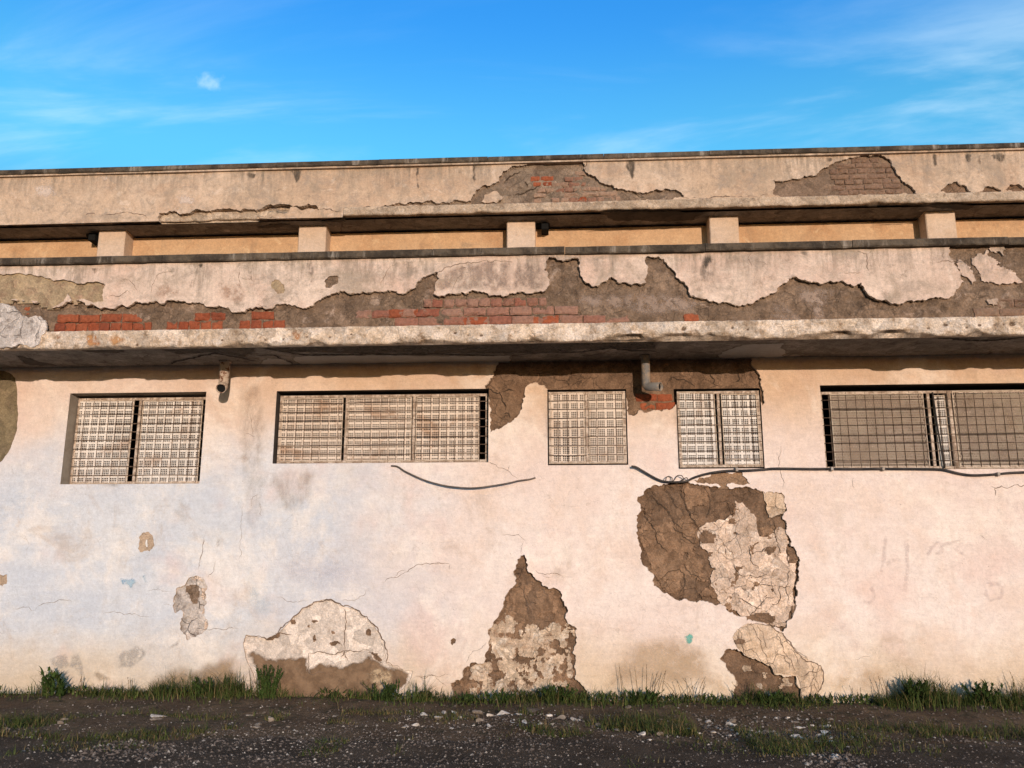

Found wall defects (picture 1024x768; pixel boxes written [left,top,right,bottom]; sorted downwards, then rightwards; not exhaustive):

spalling [158,196,346,228]
spalling [366,163,705,222]
spalling [773,155,1024,210]
spalling [0,246,1024,432]
spalling [0,371,18,462]
peeling [138,532,154,552]
spalling [636,472,800,632]
spalling [173,576,208,640]
spalling [243,599,413,699]
spalling [451,555,589,700]
spalling [720,649,801,701]